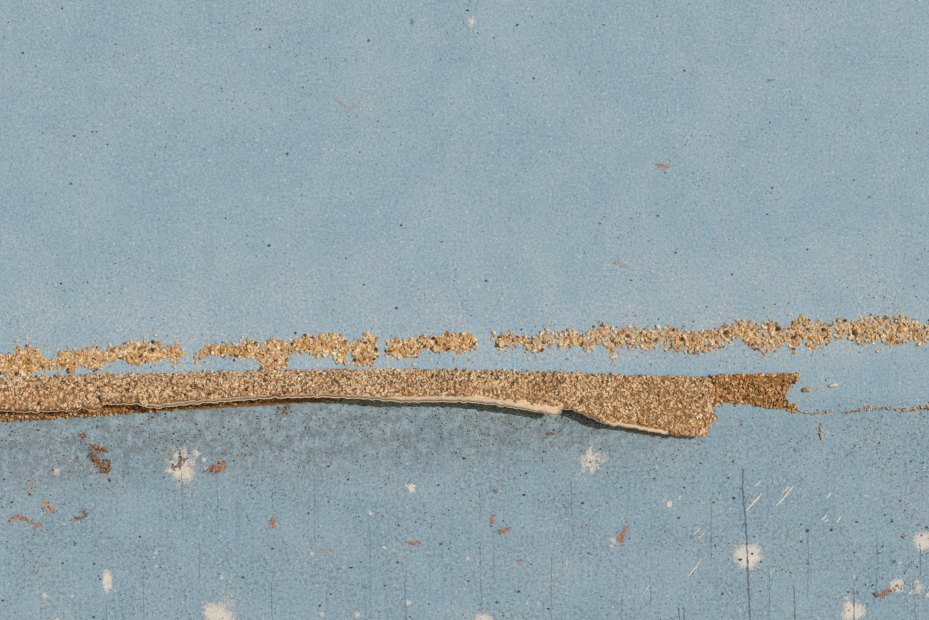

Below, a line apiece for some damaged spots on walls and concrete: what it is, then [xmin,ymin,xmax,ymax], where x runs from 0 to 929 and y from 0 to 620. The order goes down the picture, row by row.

leakage [726,534,772,577]
leakage [907,525,929,556]
leakage [198,575,244,620]
leakage [468,605,496,620]
leakage [887,561,929,599]